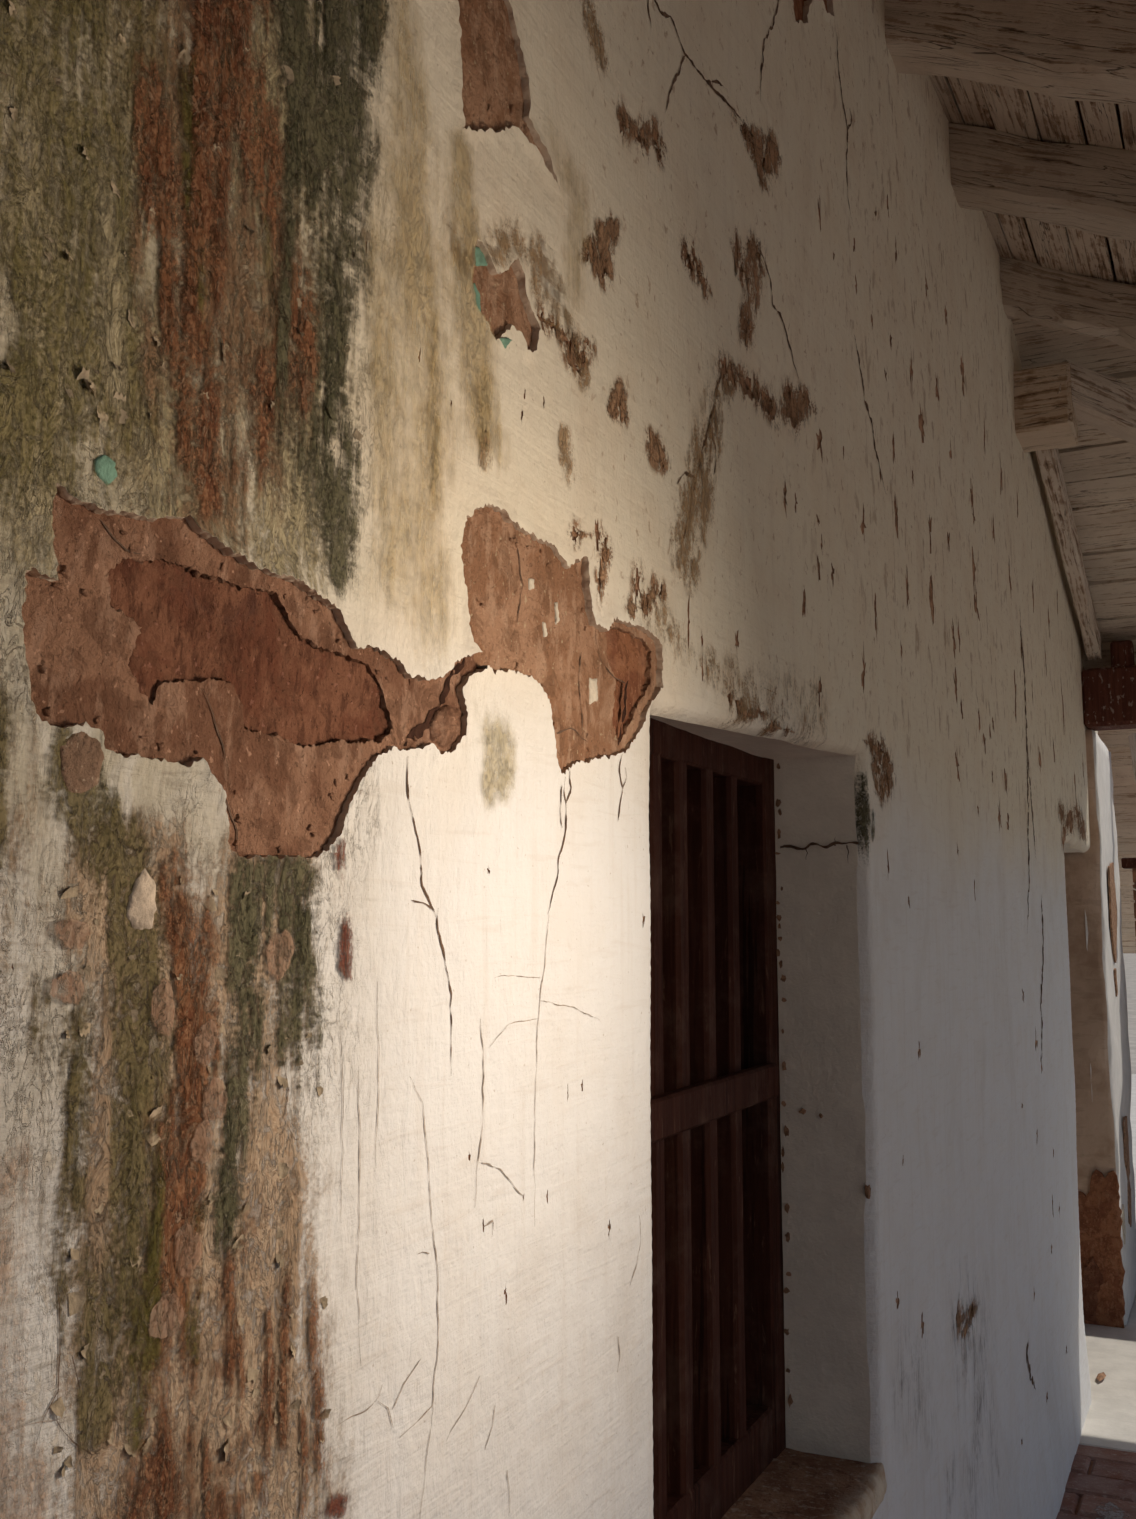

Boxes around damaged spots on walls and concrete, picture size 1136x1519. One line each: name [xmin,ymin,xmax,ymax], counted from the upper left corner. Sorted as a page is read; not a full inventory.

peeling [458,0,561,191]
crack [648,0,779,125]
water stain [264,0,423,597]
water stain [399,138,591,482]
peeling [473,240,597,379]
spalling [718,226,822,458]
peeling [22,483,667,859]
crack [618,754,627,820]
water stain [67,1000,166,1329]
water stain [196,854,324,1261]
crack [339,981,510,1515]
crack [407,766,593,1234]